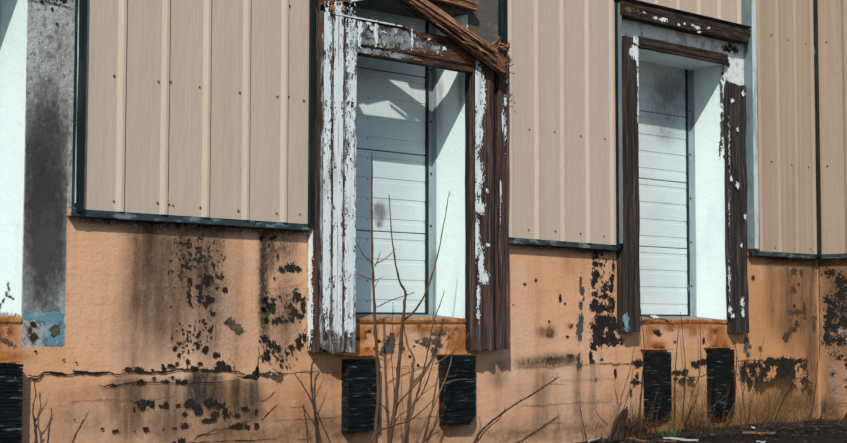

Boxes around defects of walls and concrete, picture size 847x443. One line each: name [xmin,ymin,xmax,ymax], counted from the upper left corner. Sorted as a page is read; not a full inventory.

peeling [719,43,746,189]
damp [25,104,65,307]
peeling [122,223,235,386]
crack [28,347,339,443]
damp [80,218,305,335]
peeling [223,316,245,335]
peeling [241,0,459,383]
peeling [475,60,490,324]
peeling [728,266,745,325]
damp [758,256,829,382]